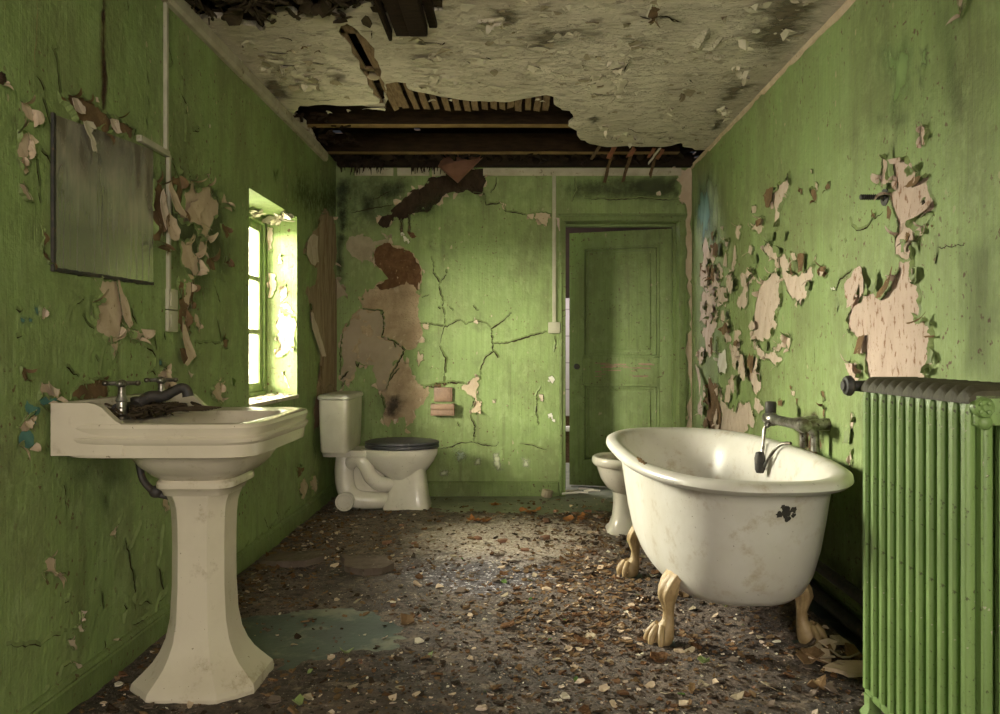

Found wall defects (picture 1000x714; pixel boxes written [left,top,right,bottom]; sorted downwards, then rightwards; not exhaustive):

flaking render [0,71,13,90]
peeling [15,94,45,203]
peeling [57,88,136,152]
peeling [238,31,385,114]
peeling [407,0,767,148]
peeling [721,2,805,53]
peeling [83,162,236,390]
flaking render [296,168,487,501]
crack [419,256,557,450]
peeling [672,166,831,433]
peeling [840,146,937,381]